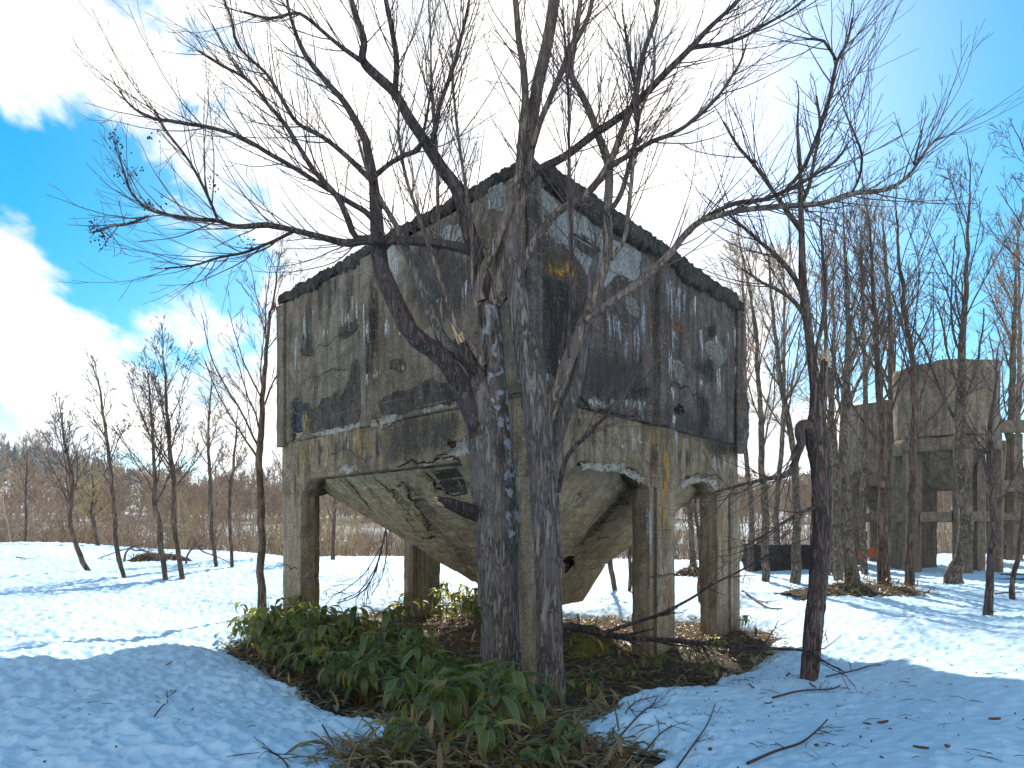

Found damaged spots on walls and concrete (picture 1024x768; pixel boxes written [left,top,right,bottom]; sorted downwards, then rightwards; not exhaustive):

peeling [542,188,641,287]
leakage [672,324,737,470]
crack [330,447,460,539]
peeling [391,438,469,538]
spalling [580,462,645,484]
spalling [681,476,721,491]